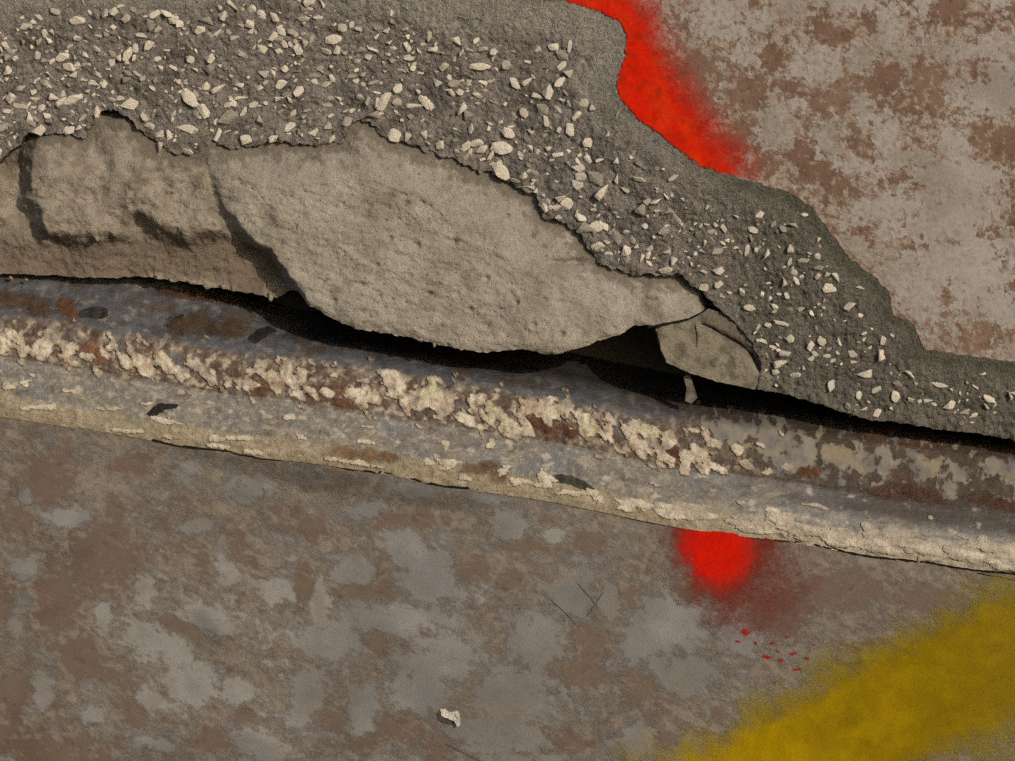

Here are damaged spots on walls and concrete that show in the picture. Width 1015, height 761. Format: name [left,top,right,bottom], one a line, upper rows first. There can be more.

spalling [0,0,1015,507]
crack [647,319,760,372]
rust [333,446,399,461]
rust [462,460,506,481]
rust [527,414,579,440]
peeling [0,402,1015,761]